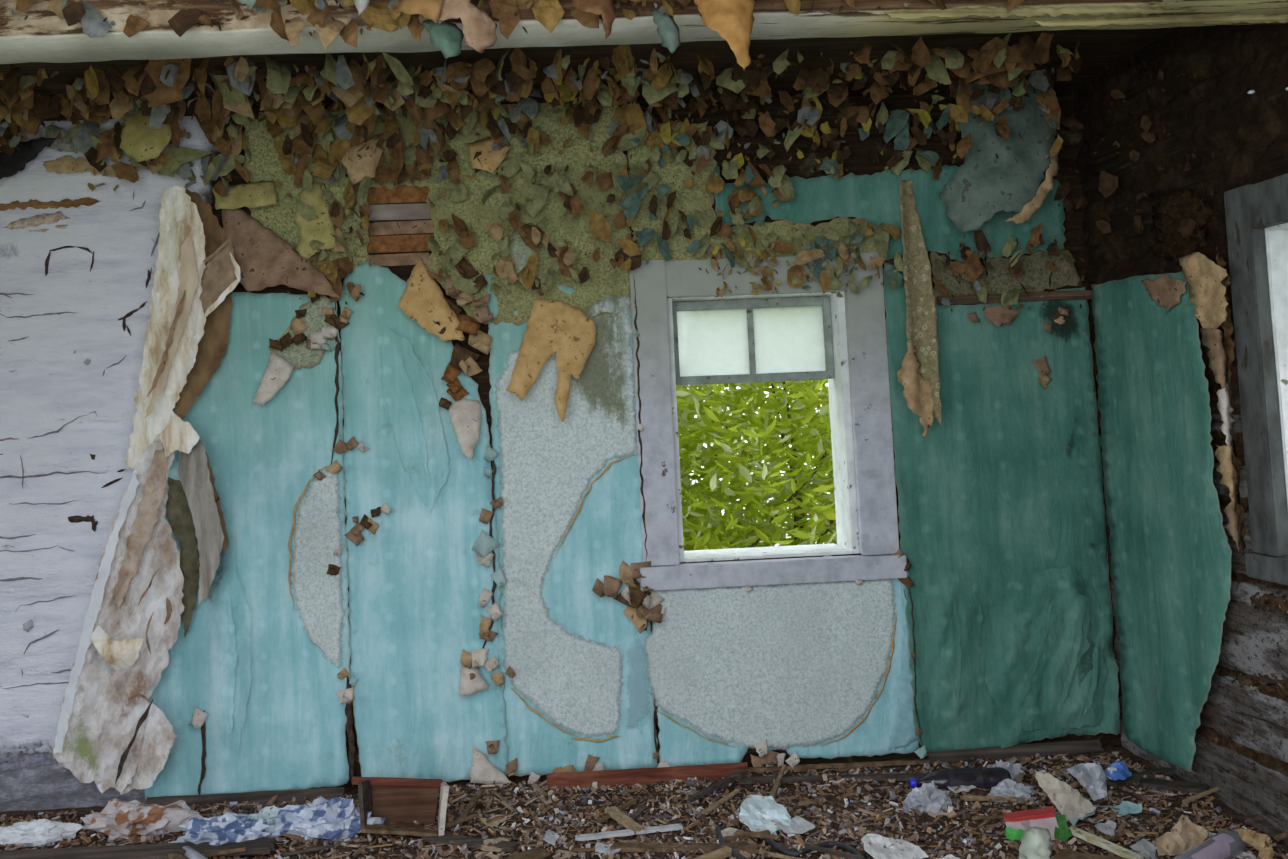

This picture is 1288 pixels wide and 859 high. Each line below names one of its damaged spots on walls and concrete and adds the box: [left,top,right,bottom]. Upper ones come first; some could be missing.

peeling [0,0,1085,750]
peeling [1178,245,1246,558]